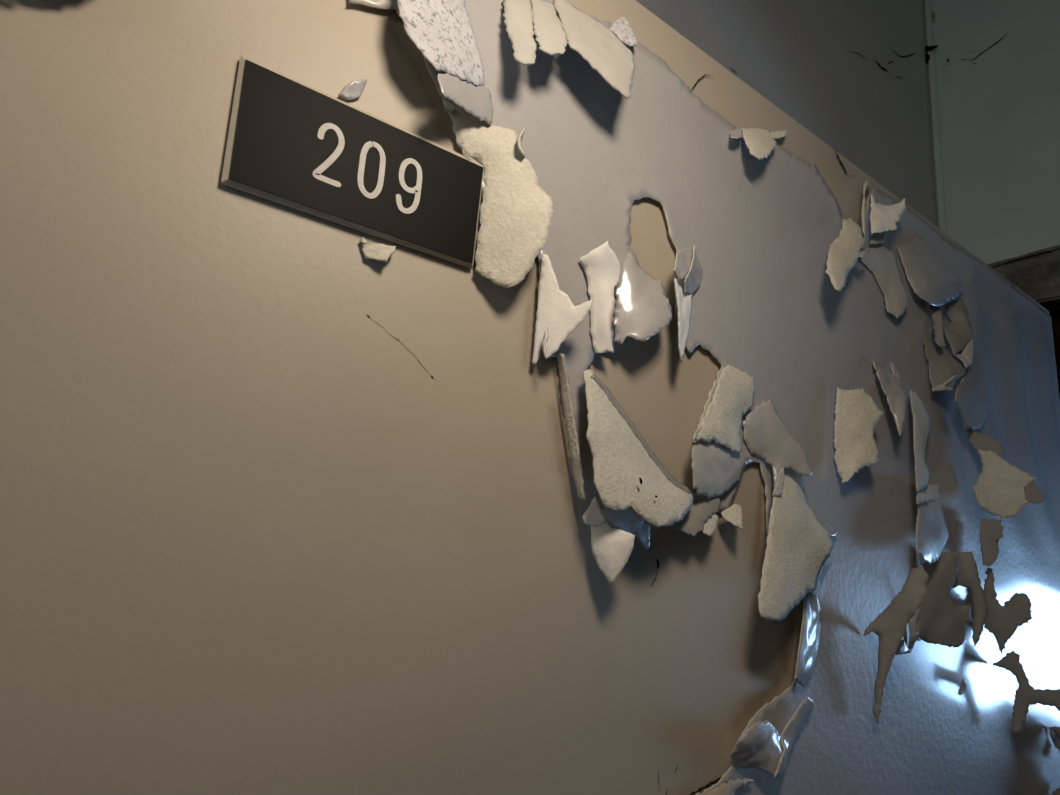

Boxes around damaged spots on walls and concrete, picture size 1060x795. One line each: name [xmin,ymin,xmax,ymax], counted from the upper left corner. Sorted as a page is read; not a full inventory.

crack [850,47,917,80]
crack [962,33,1007,64]
peeling [338,79,368,100]
peeling [348,0,1060,795]